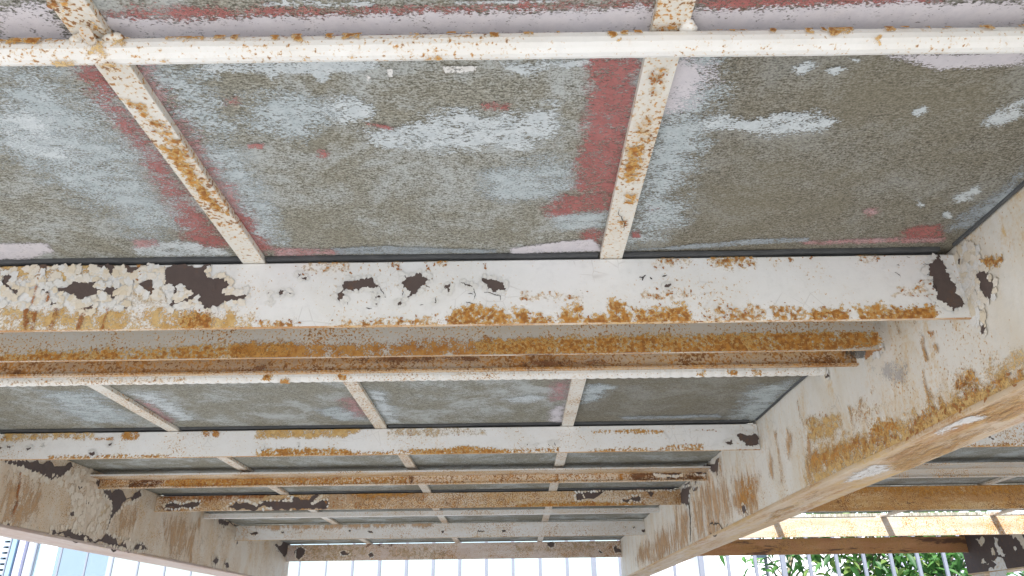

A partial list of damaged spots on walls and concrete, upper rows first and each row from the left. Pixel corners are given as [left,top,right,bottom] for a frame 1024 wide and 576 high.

corrosion [165,34,240,42]
corrosion [805,27,854,36]
corrosion [648,69,668,97]
corrosion [119,98,230,216]
corrosion [622,118,651,204]
peeling [0,263,251,317]
peeling [331,268,509,308]
peeling [920,240,998,338]
corrosion [0,265,1024,523]
peeling [0,441,149,553]
peeling [213,494,330,546]
peeling [573,429,760,510]